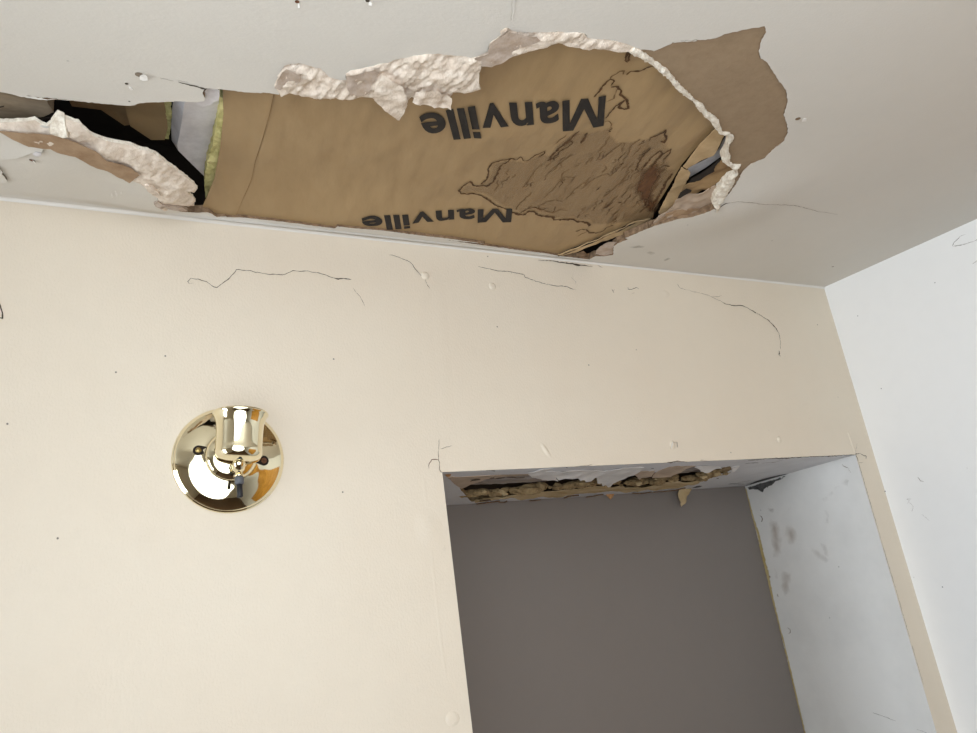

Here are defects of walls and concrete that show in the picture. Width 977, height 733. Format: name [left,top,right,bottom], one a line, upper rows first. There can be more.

peeling [0,140,43,183]
spalling [37,100,206,205]
leakage [458,52,673,236]
spalling [566,136,725,253]
crack [187,269,365,306]
crack [678,285,781,354]
peeling [463,465,740,506]